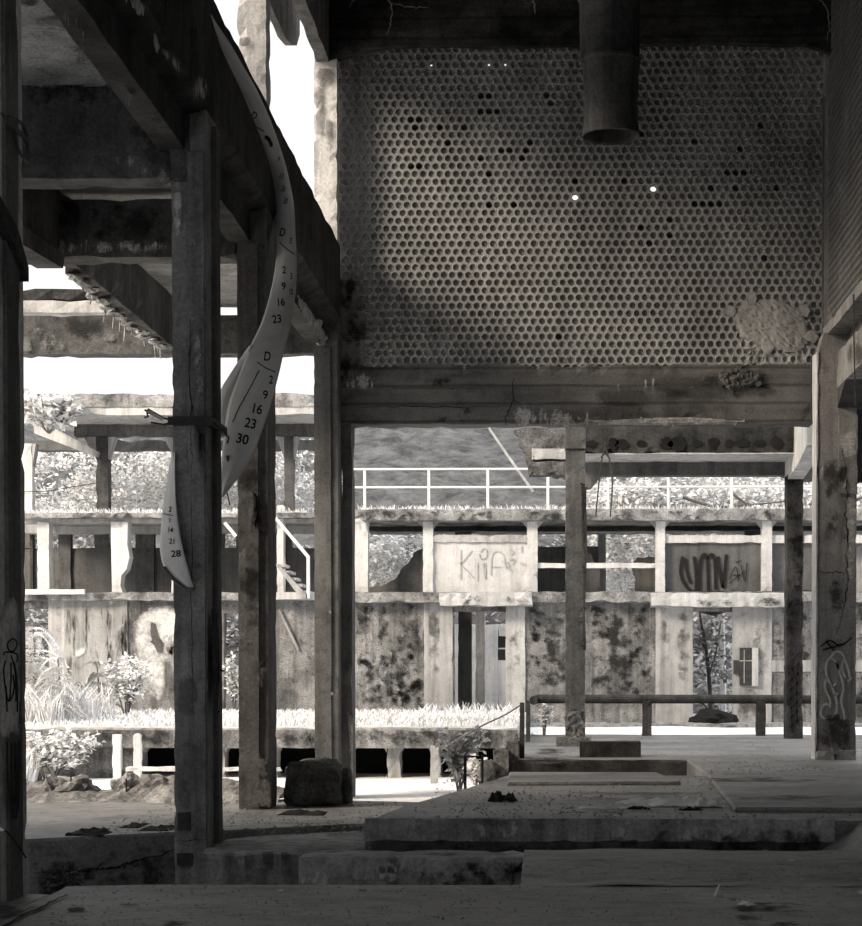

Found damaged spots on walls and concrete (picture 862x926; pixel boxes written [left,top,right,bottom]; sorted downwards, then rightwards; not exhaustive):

crack [387,0,426,33]
peeling [23,328,64,351]
spalling [67,273,168,359]
crack [359,378,518,426]
leakage [823,460,846,498]
crack [819,454,850,635]
leakage [357,604,440,708]
leakage [507,597,565,685]
leakage [591,606,651,695]
leakage [820,715,849,750]
crack [36,831,207,874]
crack [0,894,68,926]